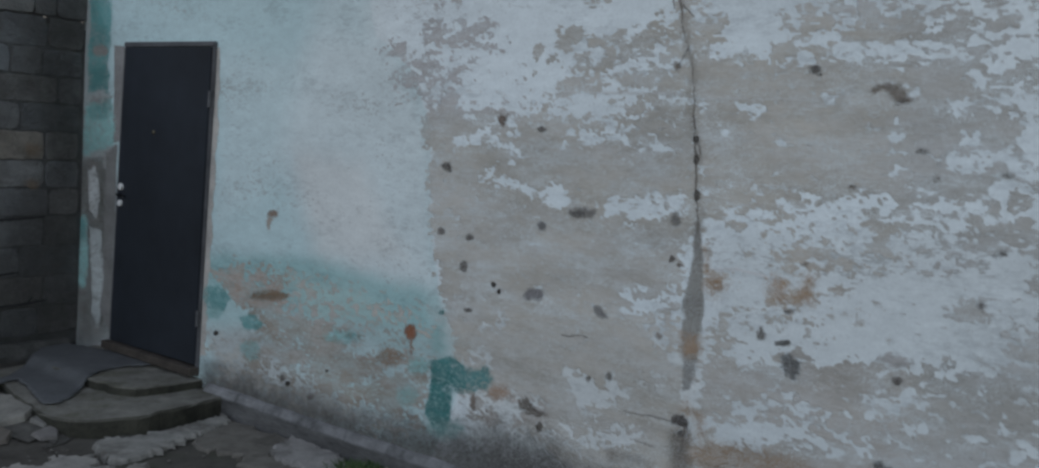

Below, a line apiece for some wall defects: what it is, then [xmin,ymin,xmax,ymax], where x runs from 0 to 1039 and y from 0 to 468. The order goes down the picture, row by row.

crack [673,0,706,239]
peeling [374,0,1039,468]
peeling [203,254,328,362]
rust [251,289,291,302]
rust [377,322,417,368]
damp [197,352,719,468]